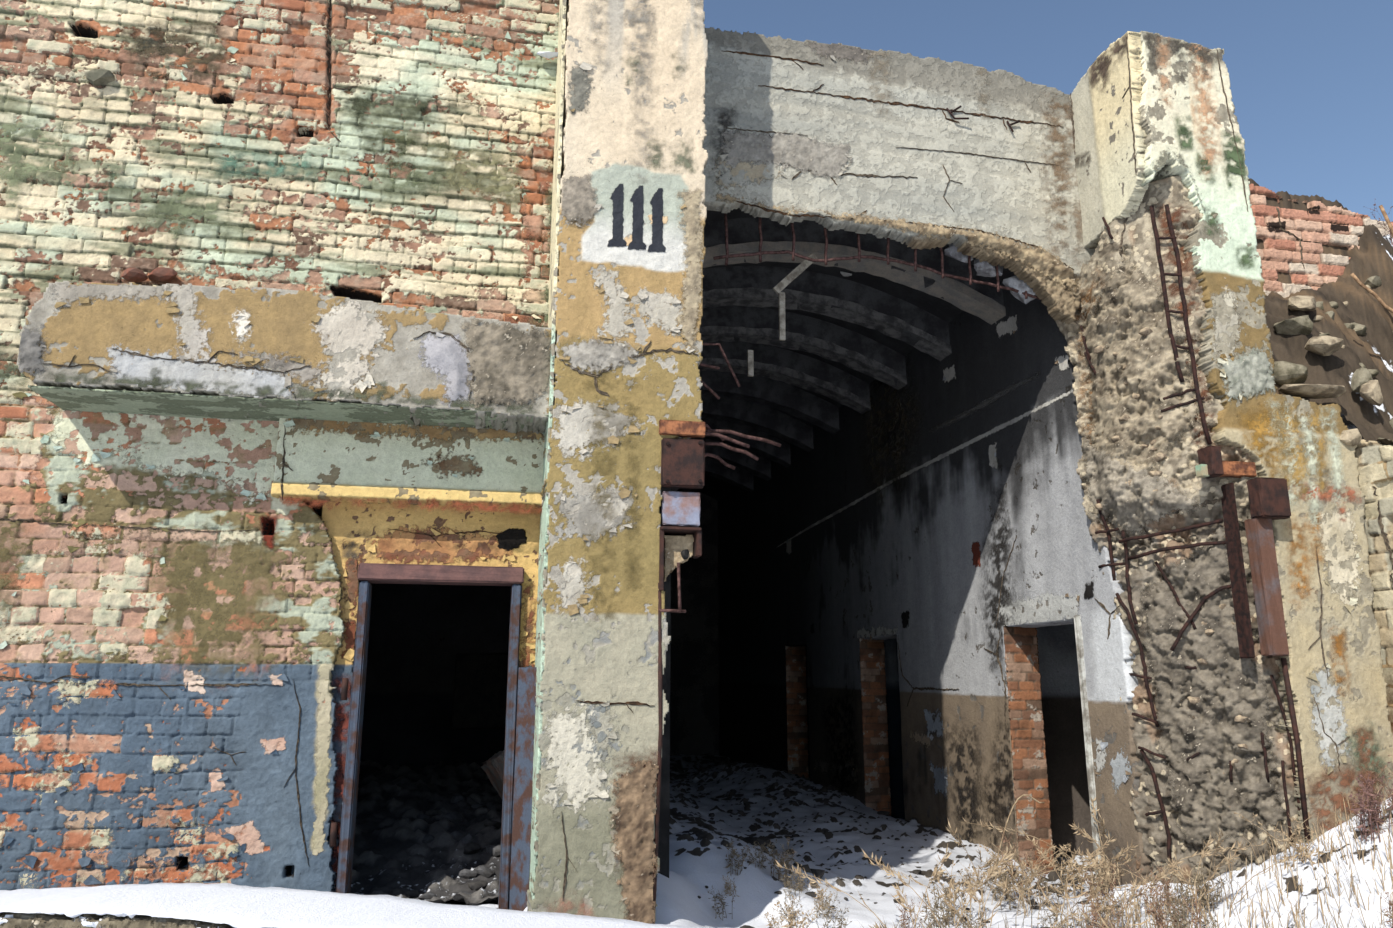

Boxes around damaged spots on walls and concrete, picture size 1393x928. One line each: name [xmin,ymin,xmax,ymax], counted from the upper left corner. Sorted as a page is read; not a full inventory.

peeling [0,24,188,85]
crack [326,0,357,142]
peeling [226,0,559,137]
crack [723,51,1076,270]
spalling [0,127,1205,505]
corrosion [1159,207,1196,317]
spalling [1211,290,1276,401]
peeling [340,526,517,662]
peeling [553,484,641,618]
peeling [0,726,264,888]
corrosion [329,679,352,883]
spalling [542,700,659,924]